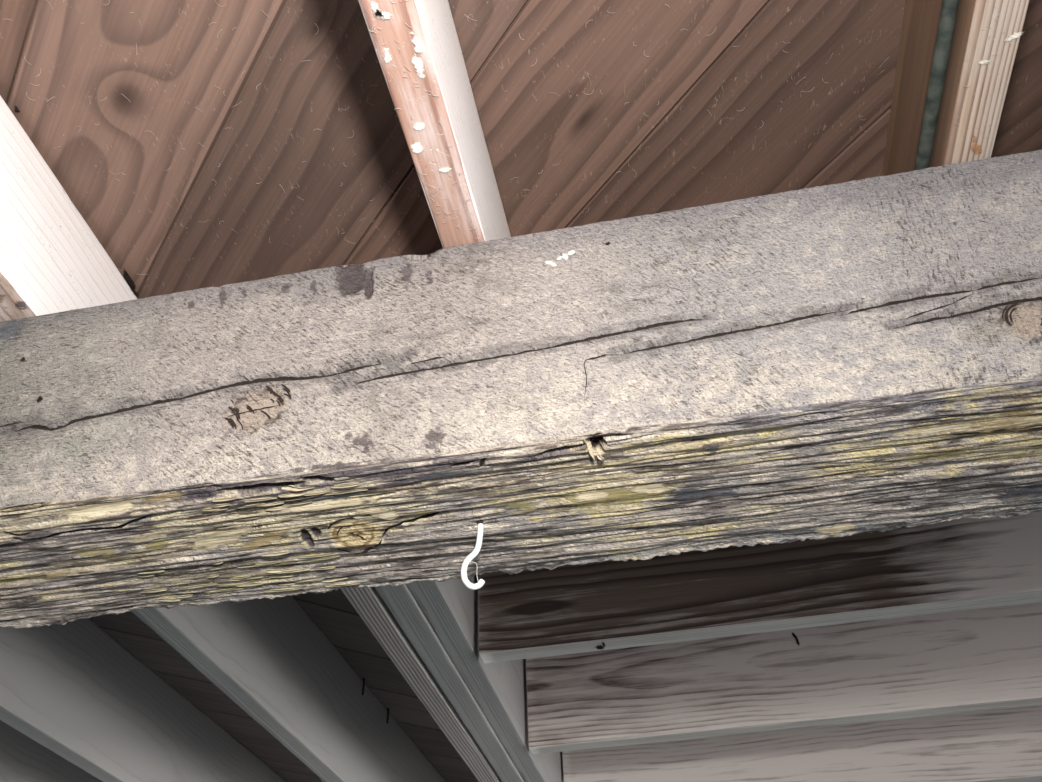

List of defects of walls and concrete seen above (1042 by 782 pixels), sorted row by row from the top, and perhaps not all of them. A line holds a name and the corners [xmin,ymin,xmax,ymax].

crack [0,278,1042,434]
damp [896,409,1042,438]
damp [293,432,389,472]
damp [425,428,446,453]
damp [887,448,978,464]
damp [415,466,493,482]
damp [252,490,394,508]
damp [494,483,738,513]
damp [998,485,1042,503]
damp [0,569,69,585]